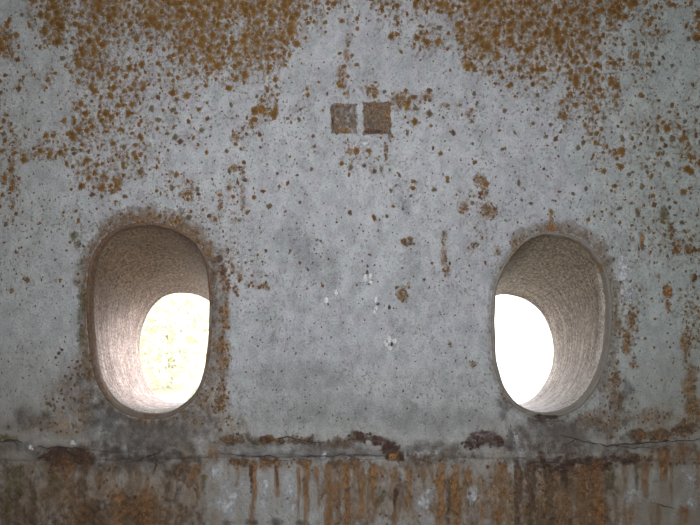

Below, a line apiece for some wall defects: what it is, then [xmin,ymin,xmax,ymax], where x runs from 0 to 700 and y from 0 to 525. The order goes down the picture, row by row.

rust [318,80,456,203]
rust [369,0,700,443]
crack [0,439,161,474]
rust [0,447,206,525]
rust [229,457,318,525]
crack [221,436,384,461]
crack [563,435,700,449]